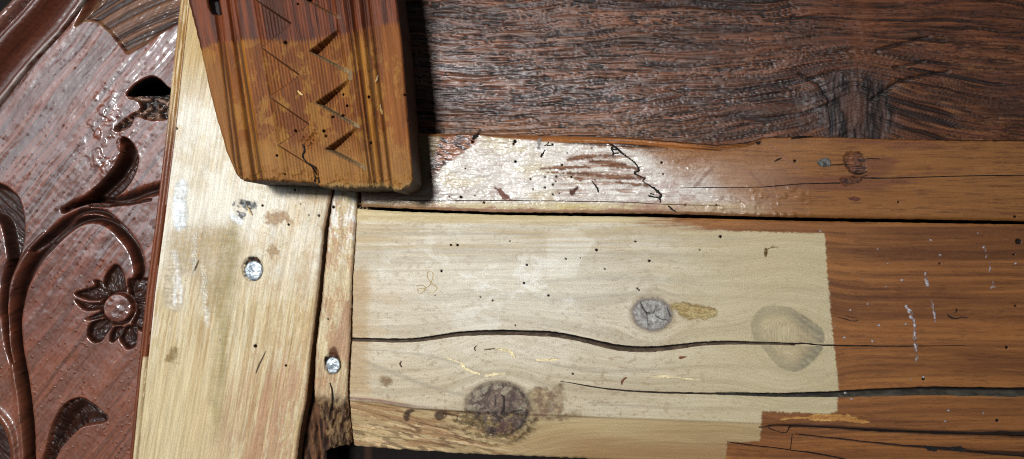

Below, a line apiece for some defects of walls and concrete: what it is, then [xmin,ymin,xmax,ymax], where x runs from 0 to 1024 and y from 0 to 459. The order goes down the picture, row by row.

crack [302,144,320,183]
crack [404,145,1024,212]
crack [352,329,965,352]
crack [561,381,1024,397]
crack [727,425,1024,459]